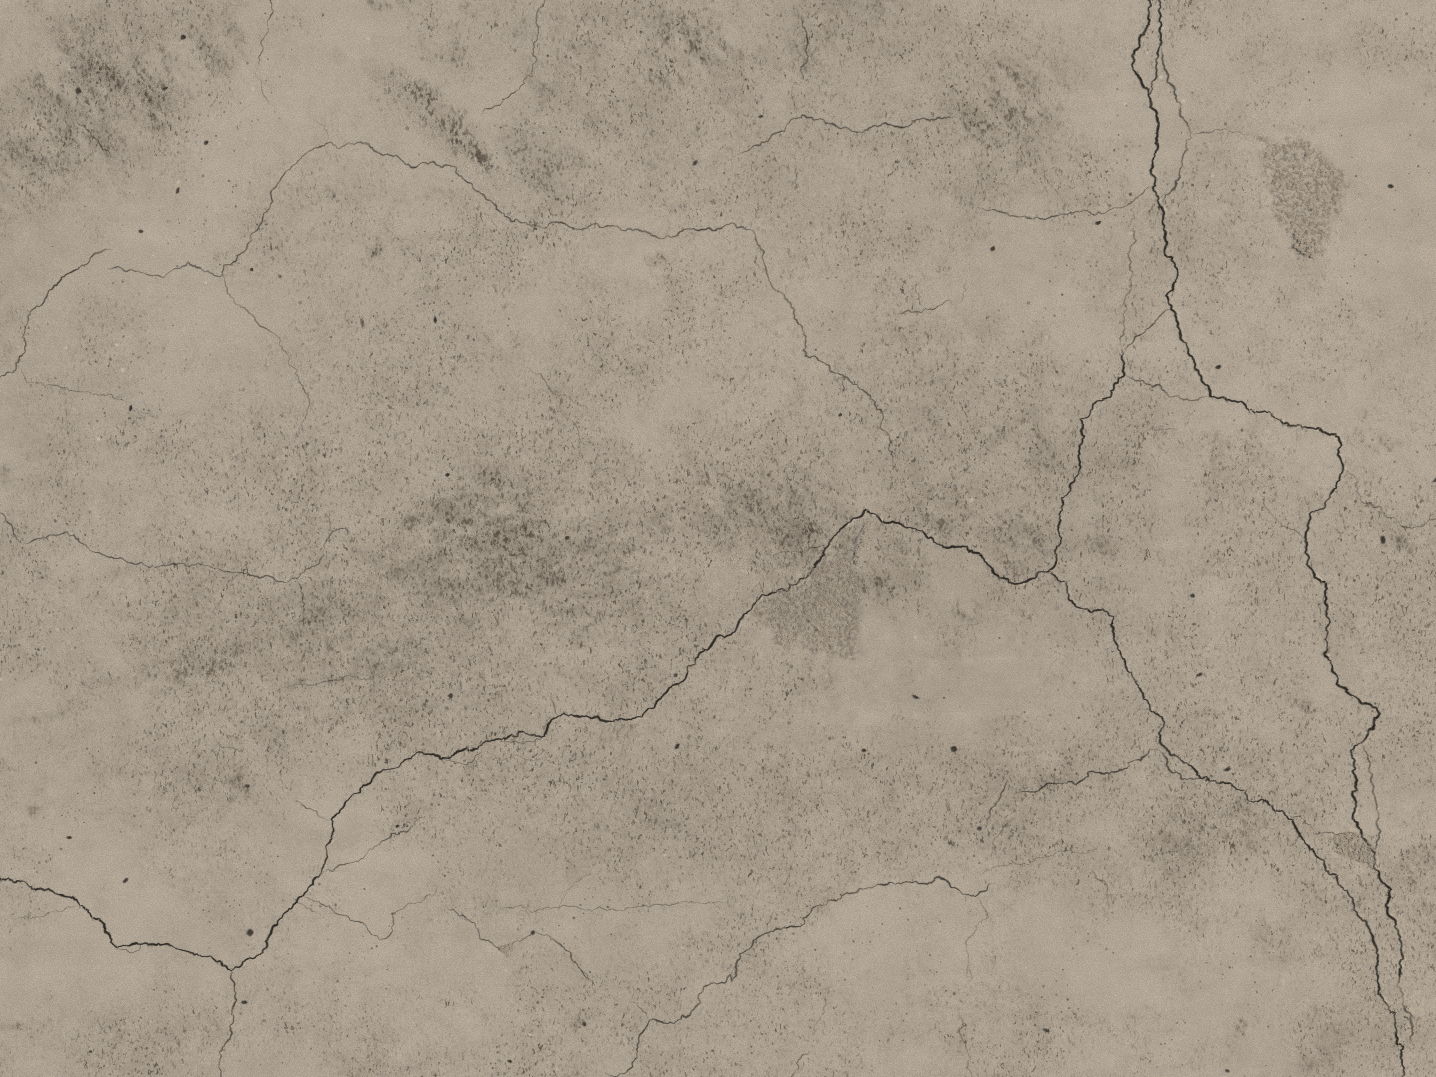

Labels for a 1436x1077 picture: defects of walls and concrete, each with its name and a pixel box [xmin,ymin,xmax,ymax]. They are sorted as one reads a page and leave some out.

crack [766,114,944,142]
crack [34,255,94,309]
crack [189,142,891,445]
crack [1131,0,1404,982]
crack [0,314,1407,1077]